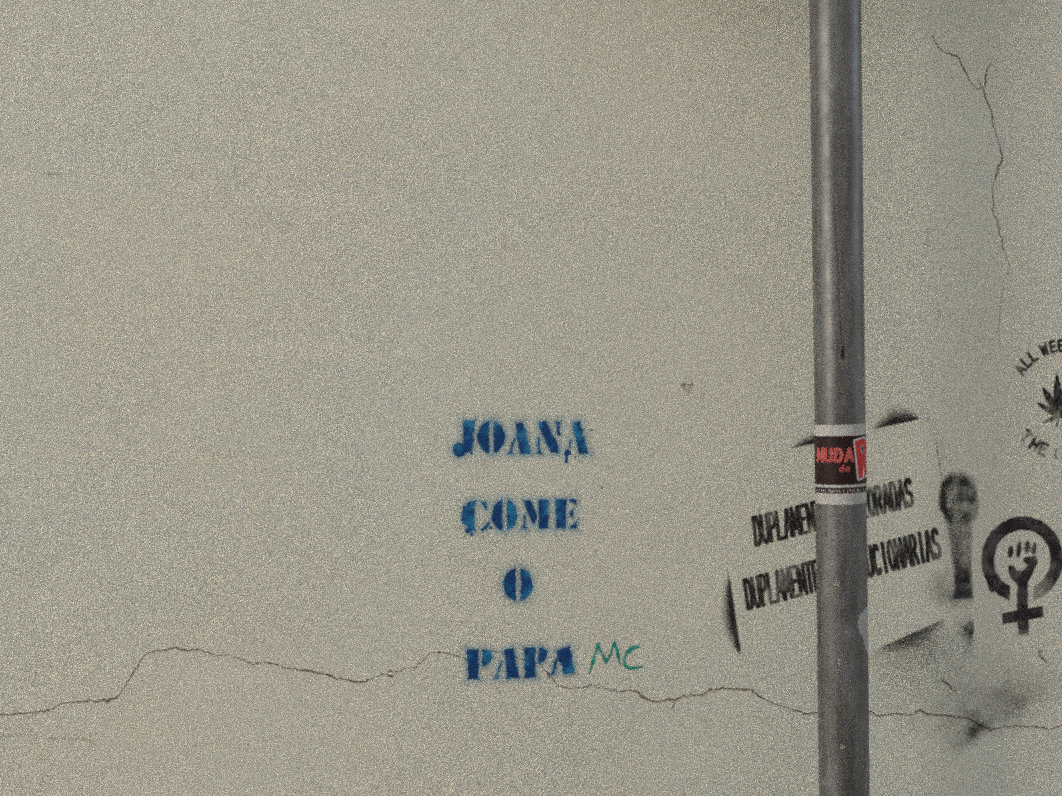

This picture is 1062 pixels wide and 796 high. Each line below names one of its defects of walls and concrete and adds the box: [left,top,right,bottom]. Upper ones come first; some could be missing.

crack [931,34,1011,335]
crack [0,646,818,717]
crack [869,708,1062,735]